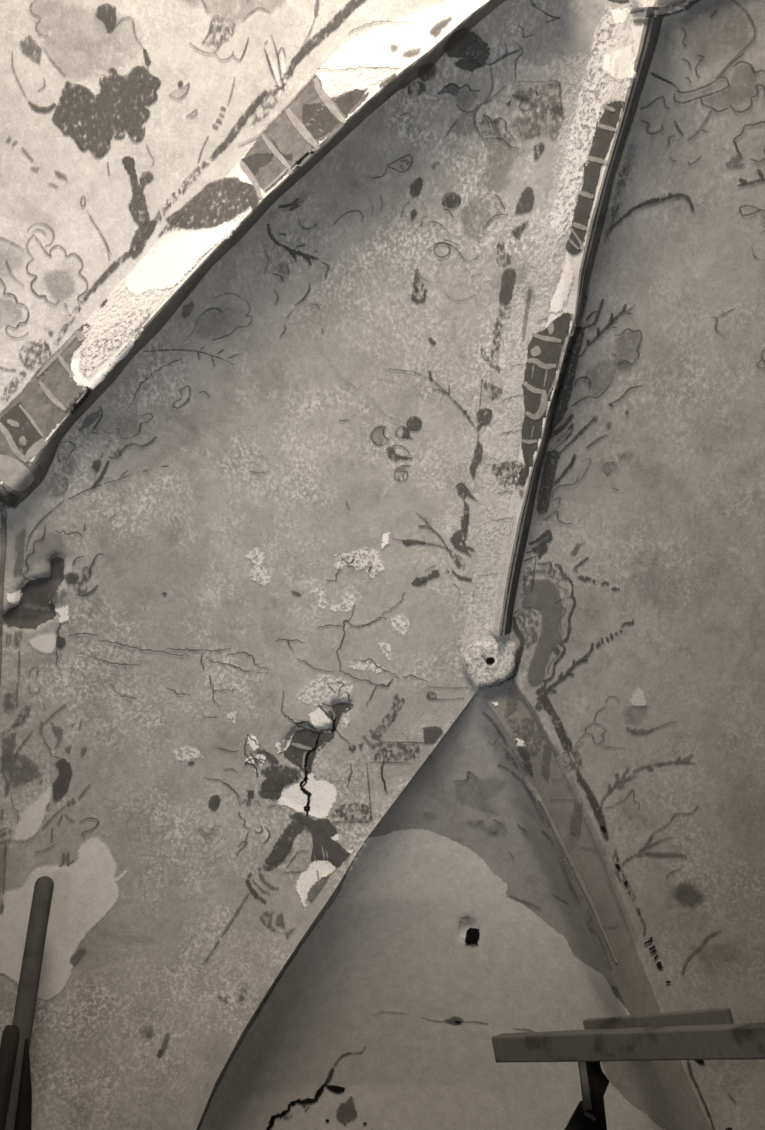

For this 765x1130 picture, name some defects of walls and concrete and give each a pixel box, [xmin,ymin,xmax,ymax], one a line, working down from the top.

spalling [429,17,451,36]
flaking render [0,45,420,510]
flaking render [463,0,682,689]
flaking render [4,529,70,671]
peeling [244,548,270,586]
peeling [292,579,357,612]
peeling [334,532,391,578]
peeling [0,693,72,806]
crack [69,593,426,819]
peeling [296,613,410,730]
peeling [423,726,443,744]
crack [266,1047,366,1130]